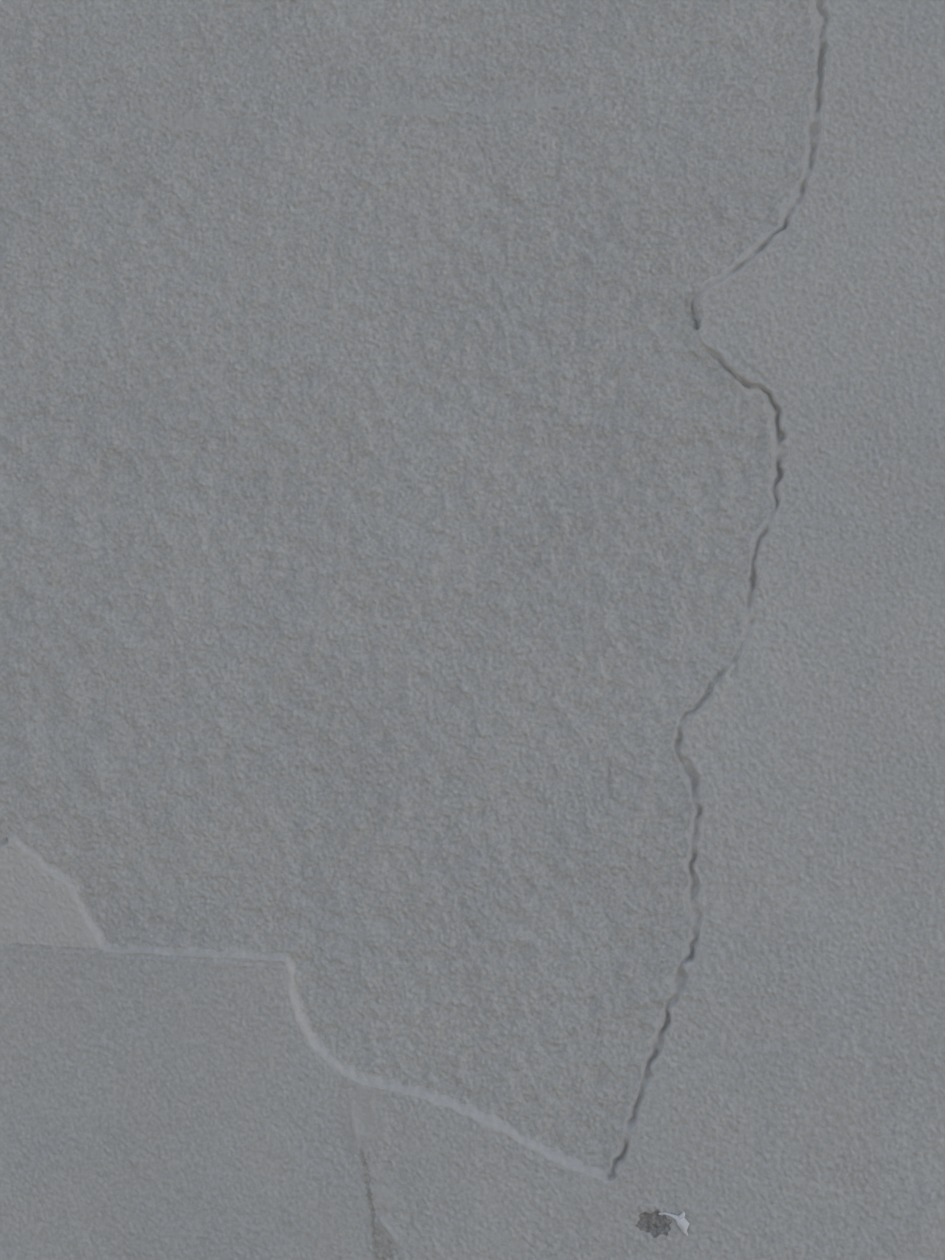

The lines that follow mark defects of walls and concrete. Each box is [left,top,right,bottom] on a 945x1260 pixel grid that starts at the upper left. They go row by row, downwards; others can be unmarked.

spalling [684,294,704,330]